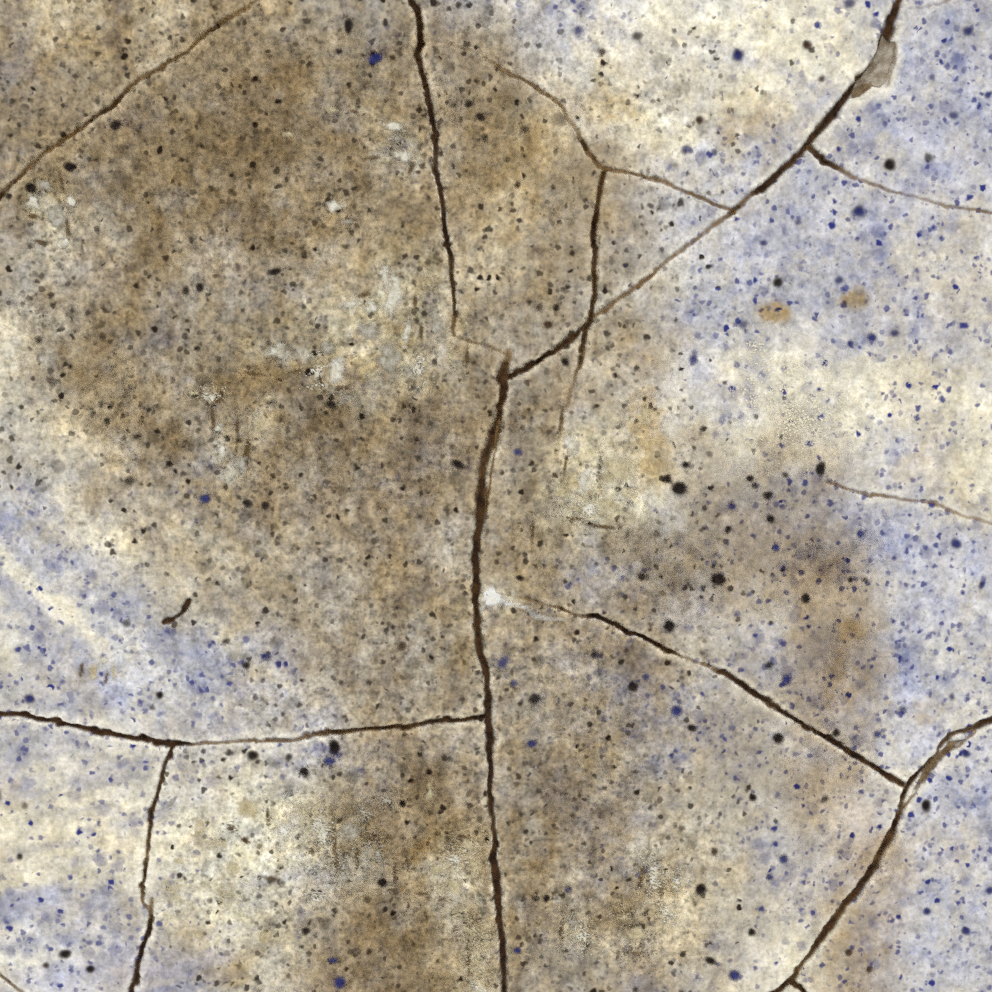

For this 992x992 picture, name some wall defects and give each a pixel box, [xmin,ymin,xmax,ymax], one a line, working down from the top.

crack [0,0,257,199]
crack [923,199,992,214]
crack [234,0,902,992]
crack [828,482,980,520]
crack [0,712,230,992]
crack [540,604,992,992]